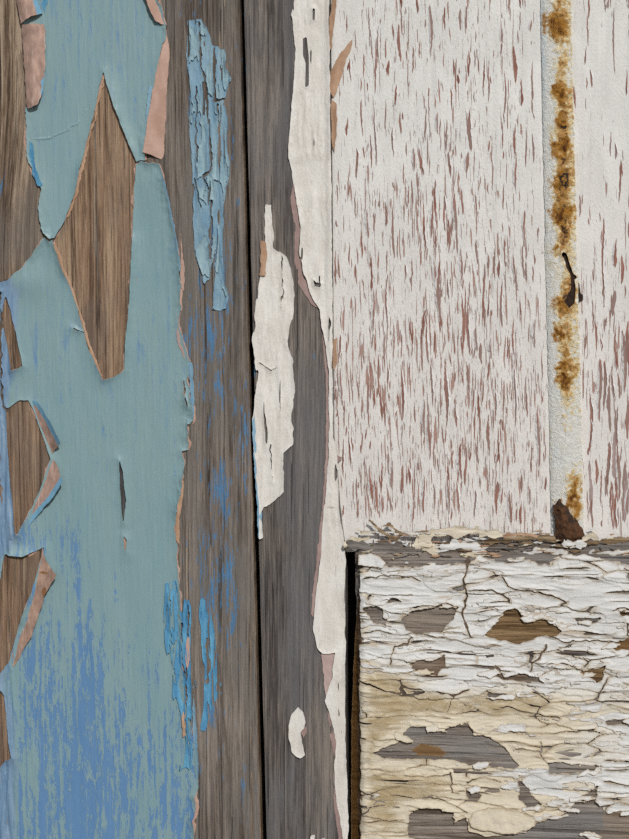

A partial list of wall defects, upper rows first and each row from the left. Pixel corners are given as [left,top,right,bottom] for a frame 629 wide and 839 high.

rust [542,11,567,40]
rust [548,82,573,234]
rust [551,322,568,342]
rust [554,351,570,388]
peeling [0,0,343,839]
crack [460,556,471,637]
crack [503,578,567,603]
peeling [485,608,561,644]
crack [390,637,412,665]
crack [358,679,469,712]
peeling [373,723,519,770]
peeling [408,781,629,839]